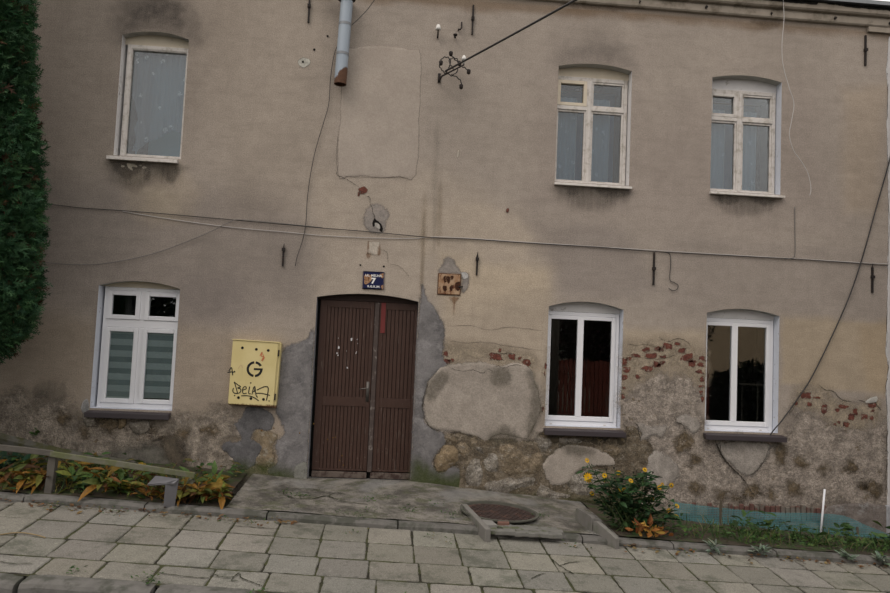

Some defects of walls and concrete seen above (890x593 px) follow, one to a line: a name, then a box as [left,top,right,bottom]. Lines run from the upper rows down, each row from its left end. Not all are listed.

flaking render [442,343,547,386]
peeling [0,388,277,471]
peeling [539,432,565,443]
peeling [576,339,888,535]